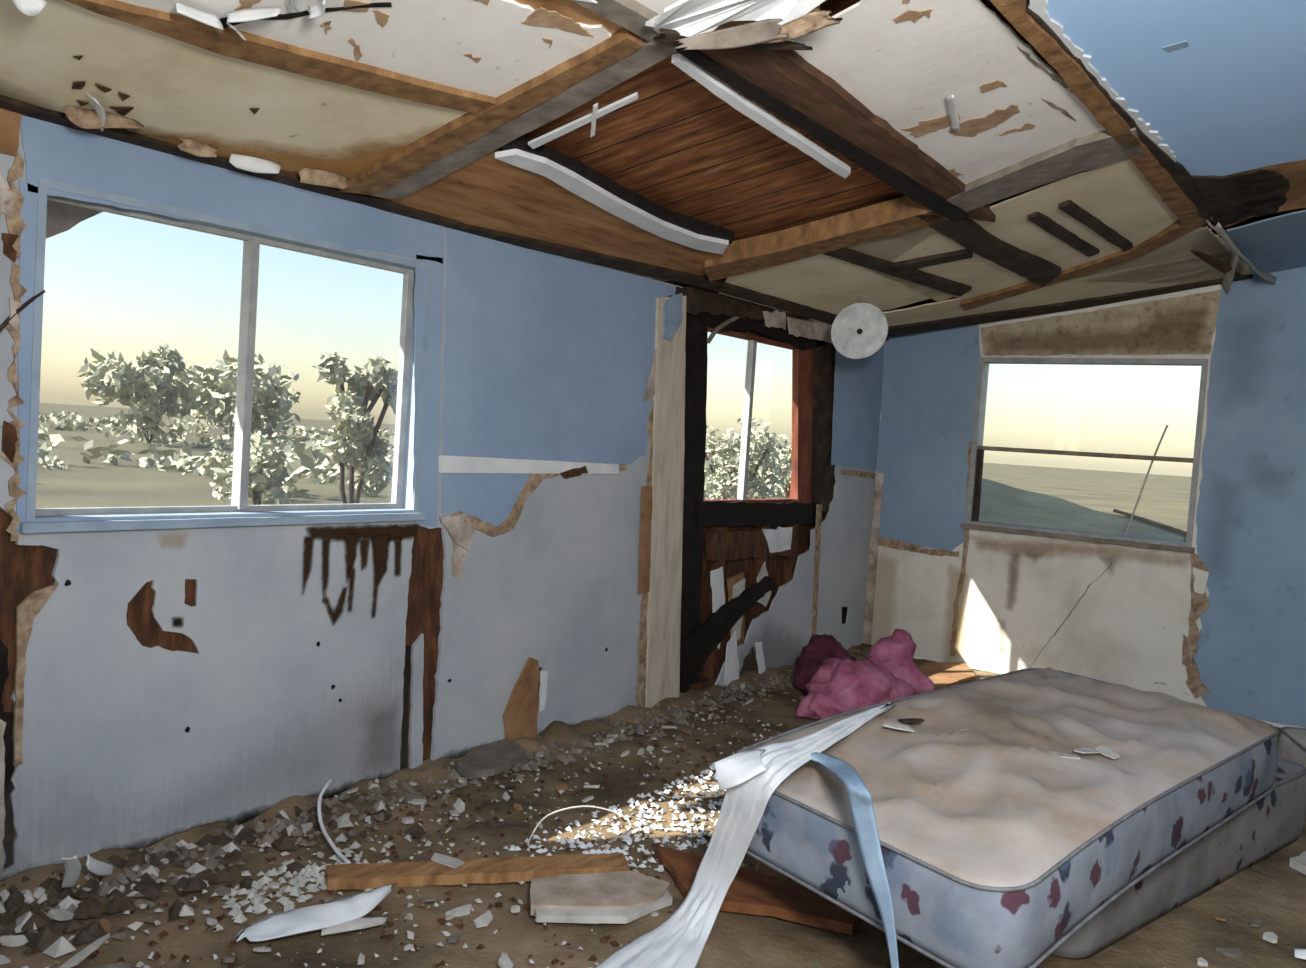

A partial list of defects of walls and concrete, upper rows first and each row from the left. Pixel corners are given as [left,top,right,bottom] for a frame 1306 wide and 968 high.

peeling [521,7,594,48]
peeling [0,108,22,156]
peeling [177,137,281,174]
peeling [299,168,349,189]
peeling [901,95,1036,138]
peeling [1191,169,1291,226]
peeling [2,421,18,463]
water stain [303,524,418,624]
peeling [710,527,793,613]
peeling [126,579,198,653]
peeling [717,616,766,685]
peeling [0,583,60,876]